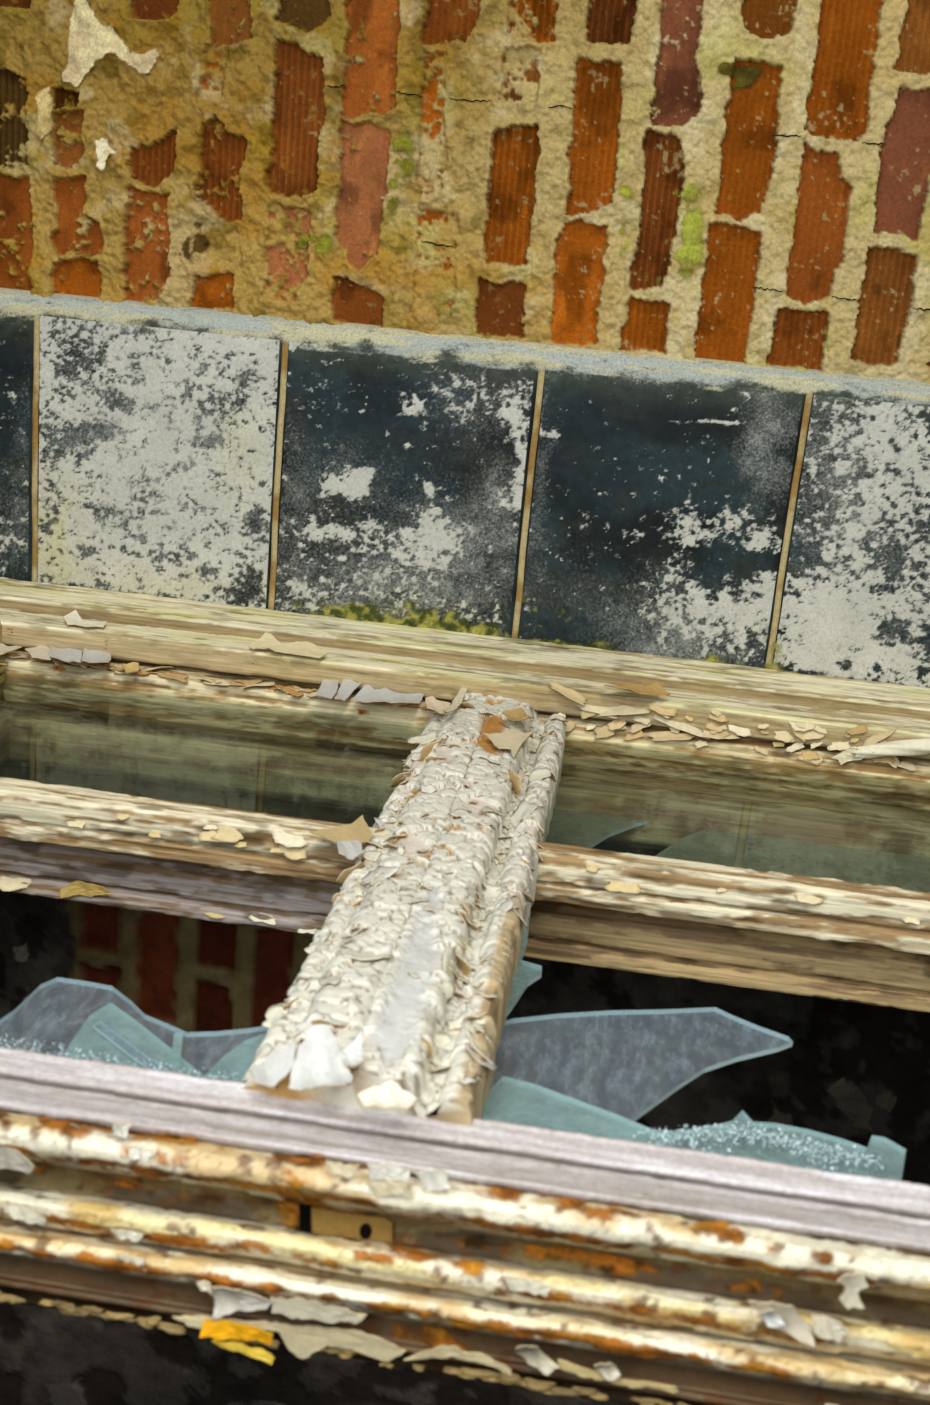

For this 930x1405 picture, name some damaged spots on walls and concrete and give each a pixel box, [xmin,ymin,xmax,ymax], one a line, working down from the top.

water stain [0,287,930,687]
peeling [0,643,930,1110]
peeling [0,1144,35,1174]
peeling [2,1203,46,1226]
rust [0,1116,404,1234]
rust [486,1186,660,1220]
rust [0,1239,167,1276]
rust [186,1272,341,1302]
peeling [0,1278,688,1405]
rust [365,1302,797,1379]
rust [337,1212,842,1298]
peeling [748,1273,869,1347]